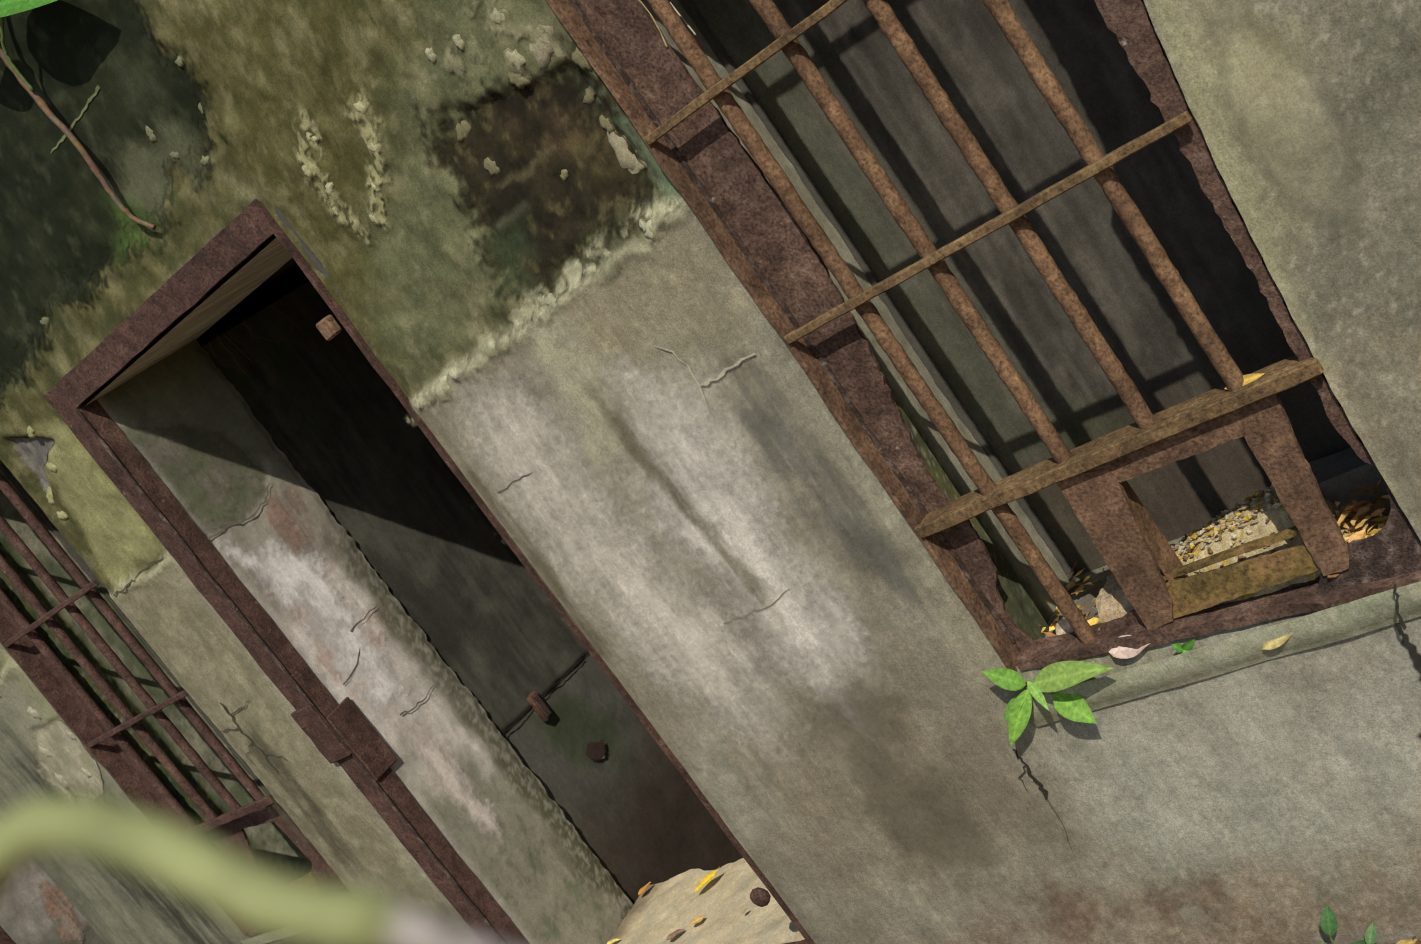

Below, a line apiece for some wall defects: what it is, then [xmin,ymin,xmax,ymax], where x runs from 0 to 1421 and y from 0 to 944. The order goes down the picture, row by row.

water stain [51,85,100,153]
peeling [293,94,391,244]
flaking render [8,426,68,520]
crack [1013,749,1073,852]
corrosion [37,882,84,944]